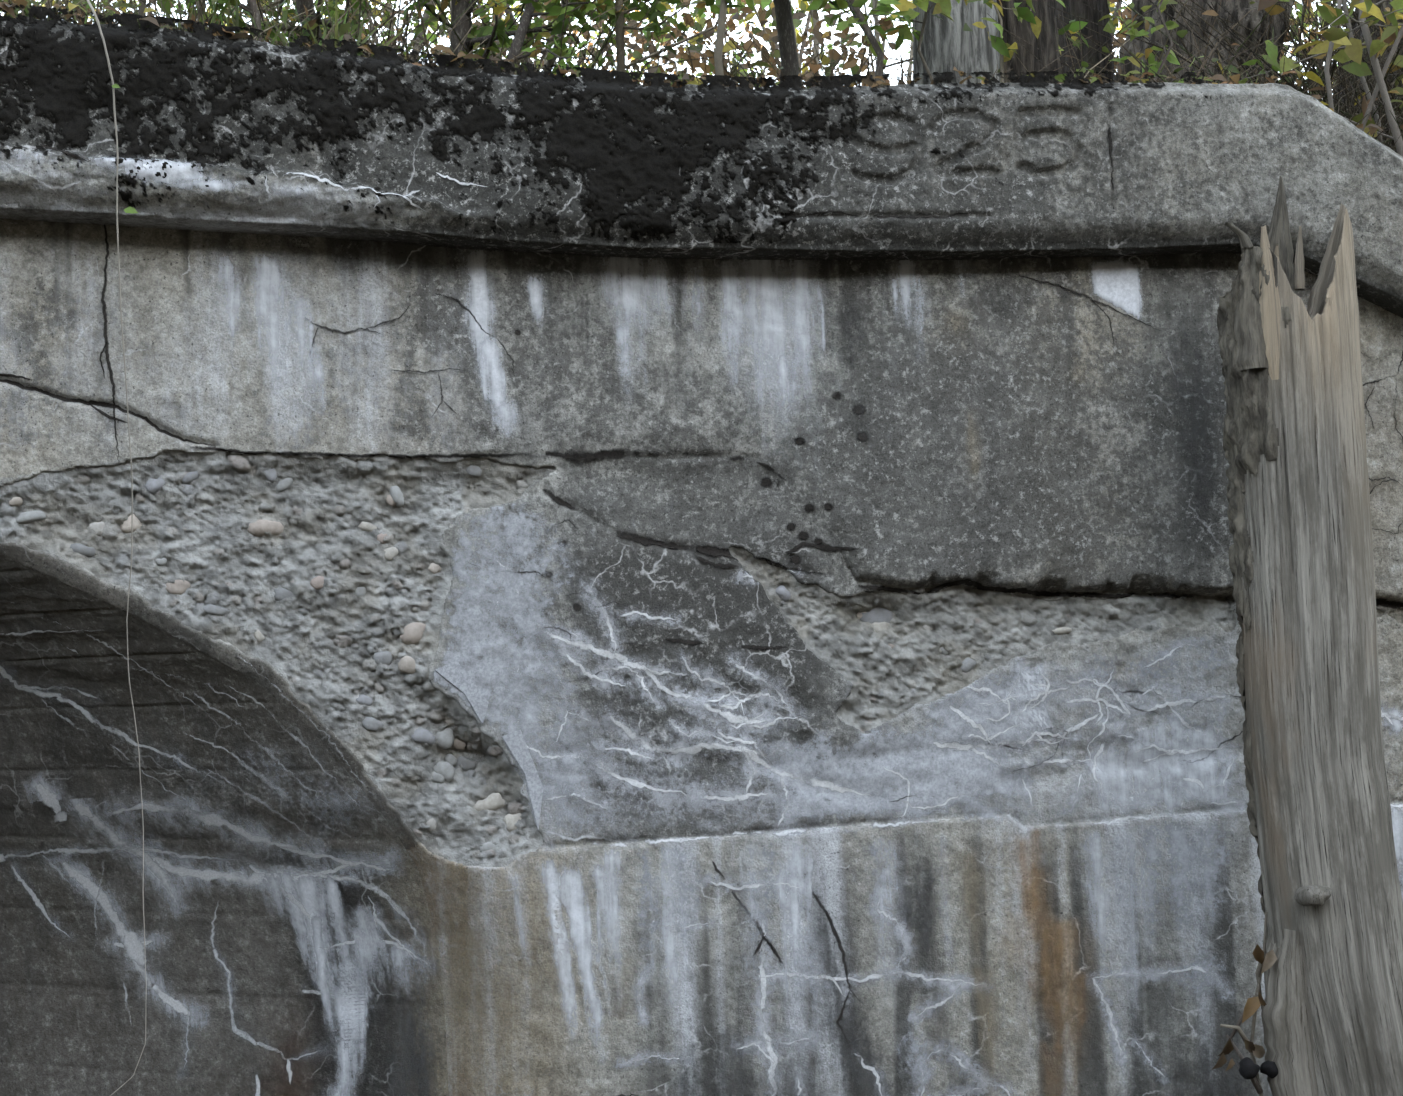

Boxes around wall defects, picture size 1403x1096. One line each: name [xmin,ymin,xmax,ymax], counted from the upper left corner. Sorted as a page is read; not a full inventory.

crack [0,225,688,464]
spalling [0,451,592,867]
crack [543,489,578,529]
crack [616,532,858,583]
spalling [761,477,780,487]
spalling [729,503,1236,733]
spalling [1376,608,1403,623]
crack [0,602,434,1096]
leakage [263,872,436,1096]
crack [451,547,1247,1096]
leakage [542,649,1234,1096]
leakage [1391,808,1403,859]